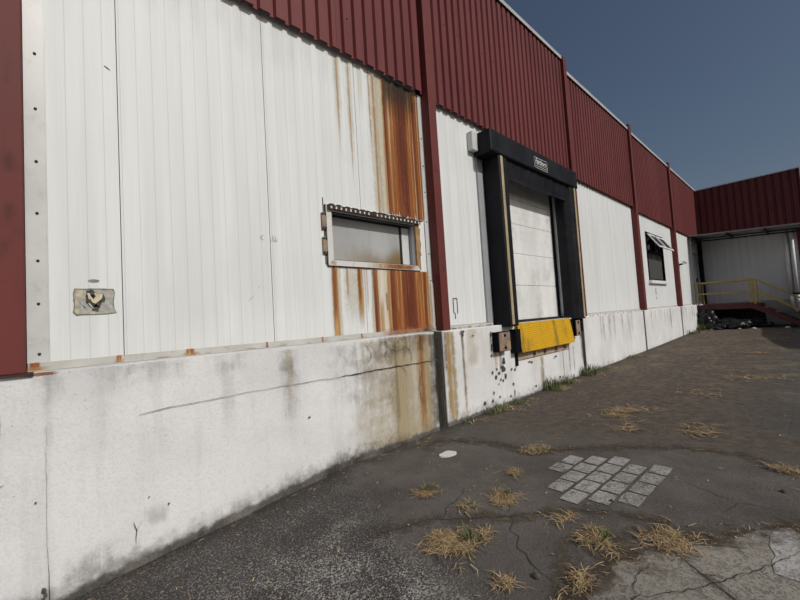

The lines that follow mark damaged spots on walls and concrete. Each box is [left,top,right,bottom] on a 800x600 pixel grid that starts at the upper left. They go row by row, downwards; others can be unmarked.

rust [370,74,425,220]
rust [332,264,436,336]
crack [139,339,435,415]
water stain [390,331,468,442]